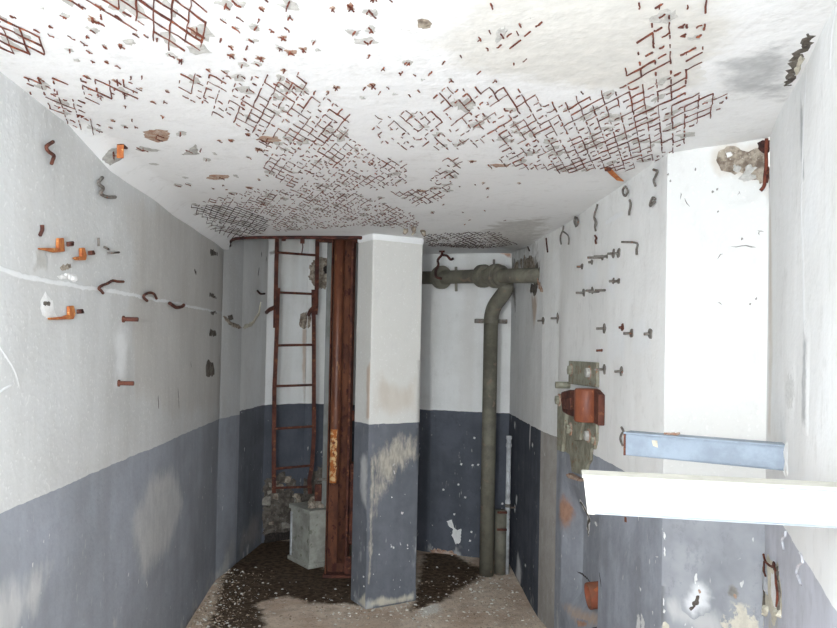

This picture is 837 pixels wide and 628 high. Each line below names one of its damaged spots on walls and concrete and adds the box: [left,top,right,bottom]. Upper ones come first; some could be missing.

peeling [160,24,216,65]
spalling [265,0,300,21]
spalling [345,0,379,46]
peeling [221,54,266,94]
flaking render [394,0,807,172]
spalling [136,129,187,152]
spalling [245,133,321,160]
spalling [695,137,770,205]
crack [0,347,21,393]
peeling [430,513,473,555]
peeling [0,523,61,628]
peeling [661,553,782,628]